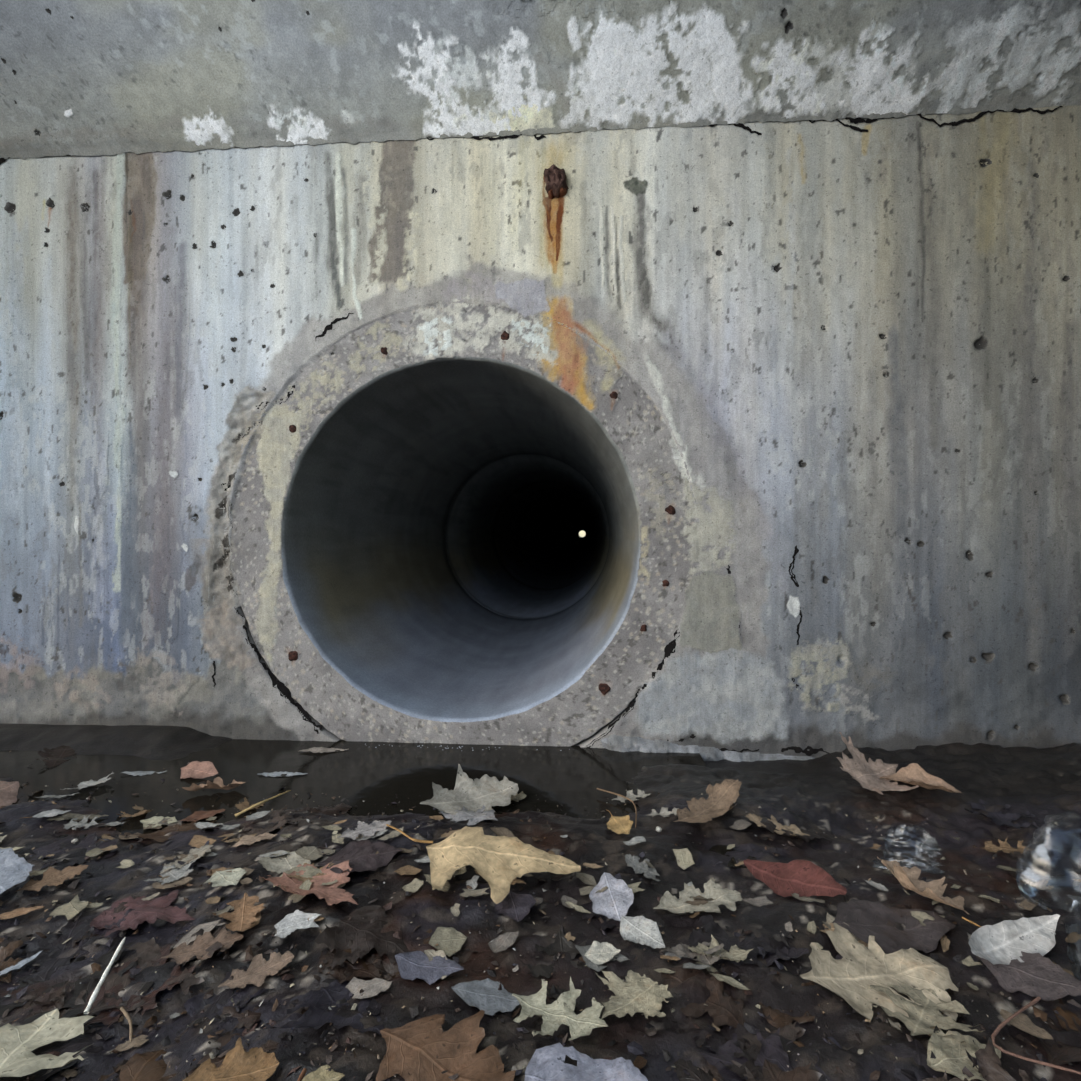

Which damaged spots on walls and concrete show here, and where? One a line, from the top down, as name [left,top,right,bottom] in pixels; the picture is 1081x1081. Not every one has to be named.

crack [471,133,545,141]
crack [709,123,762,135]
crack [809,106,1063,132]
rust [507,134,629,412]
crack [315,313,354,339]
water stain [0,0,1081,706]
crack [238,385,295,441]
crack [221,483,323,734]
crack [587,629,680,748]